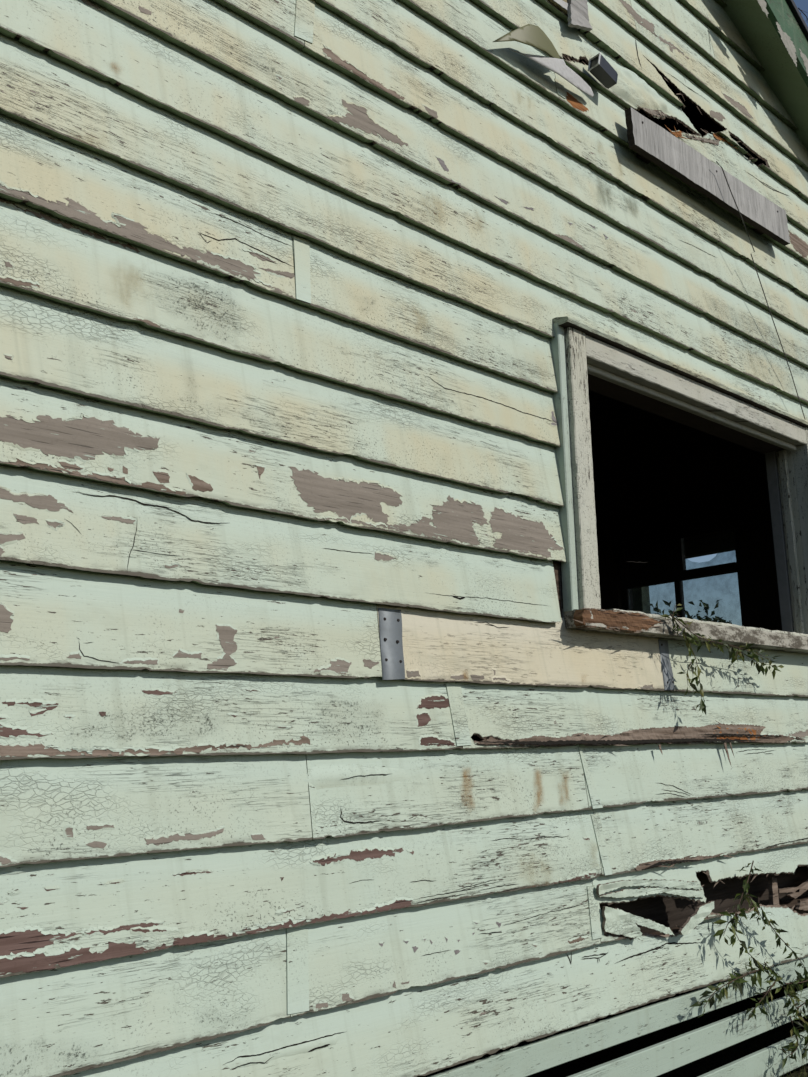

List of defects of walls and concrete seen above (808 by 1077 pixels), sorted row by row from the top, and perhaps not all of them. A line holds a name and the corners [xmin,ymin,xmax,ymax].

peeling [323,45,405,100]
peeling [320,99,408,147]
peeling [0,180,295,296]
peeling [0,413,213,495]
peeling [290,467,565,558]
peeling [0,602,15,633]
peeling [172,623,238,670]
peeling [314,657,379,675]
peeling [0,698,310,758]
peeling [416,693,457,748]
peeling [63,822,116,848]
peeling [0,897,414,975]